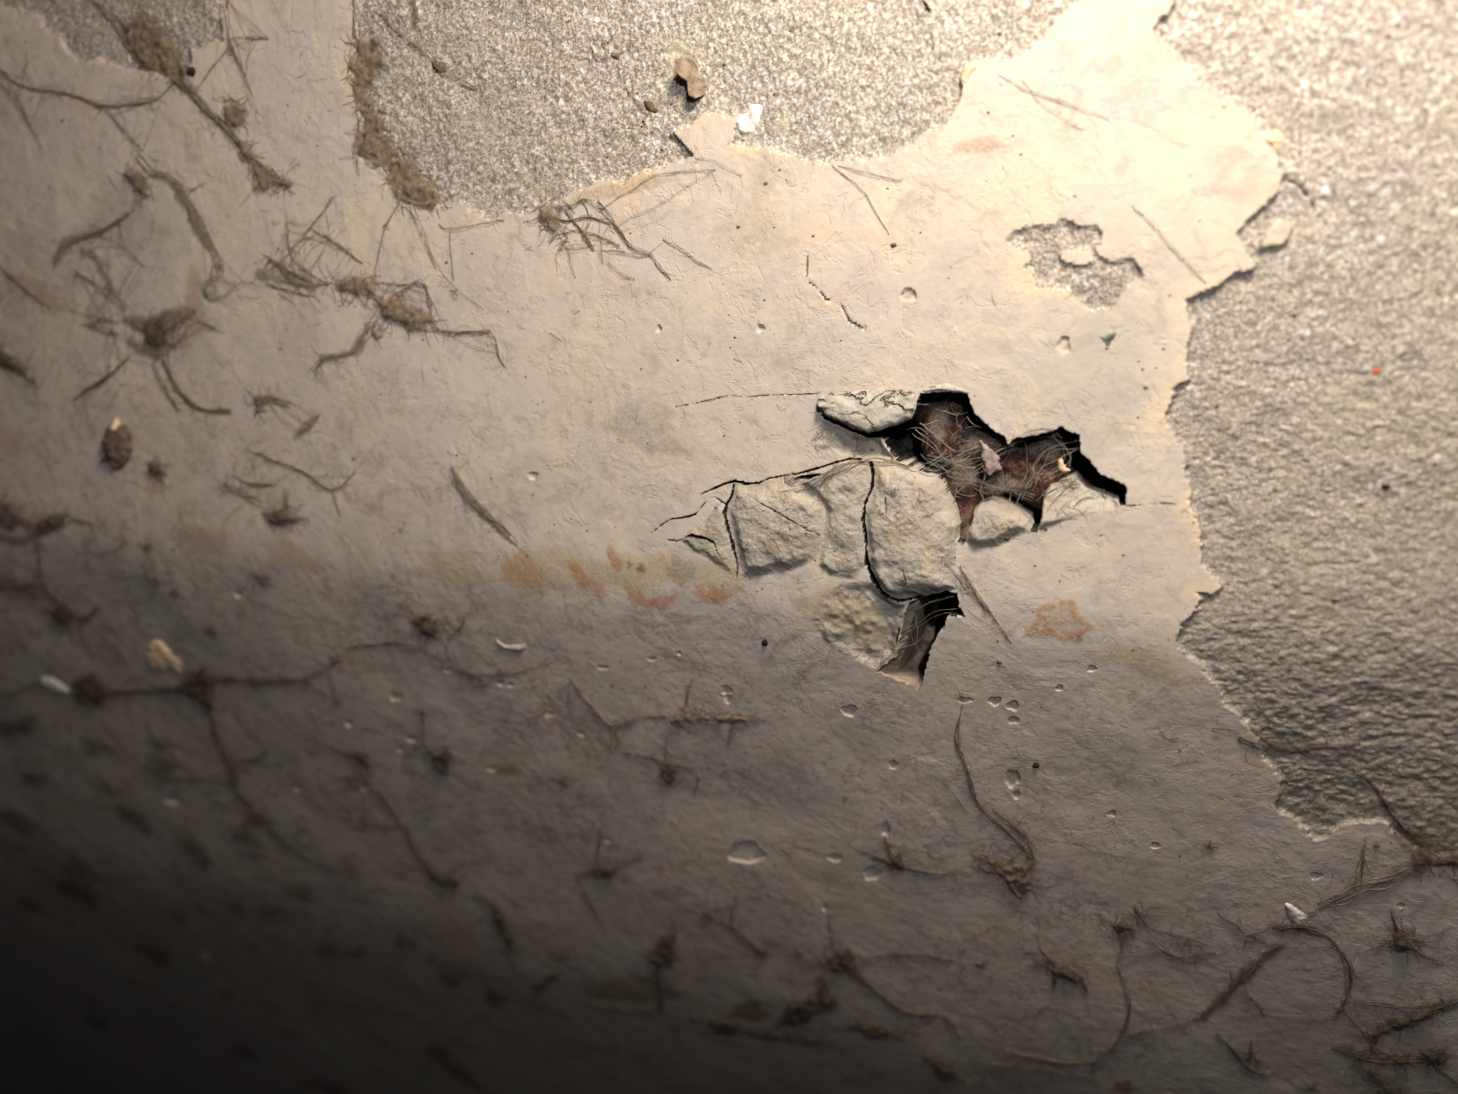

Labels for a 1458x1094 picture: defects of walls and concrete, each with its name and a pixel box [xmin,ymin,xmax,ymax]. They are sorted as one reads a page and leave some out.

flaking render [0,0,229,80]
flaking render [351,0,1079,222]
spalling [899,287,917,302]
flaking render [1006,218,1144,313]
spalling [811,383,1128,549]
flaking render [1153,0,1458,857]
corrosion [503,547,740,608]
crack [652,458,922,647]
flaking render [41,676,70,694]
flaking render [146,640,183,673]
spalling [810,580,965,692]
spalling [957,696,1020,724]